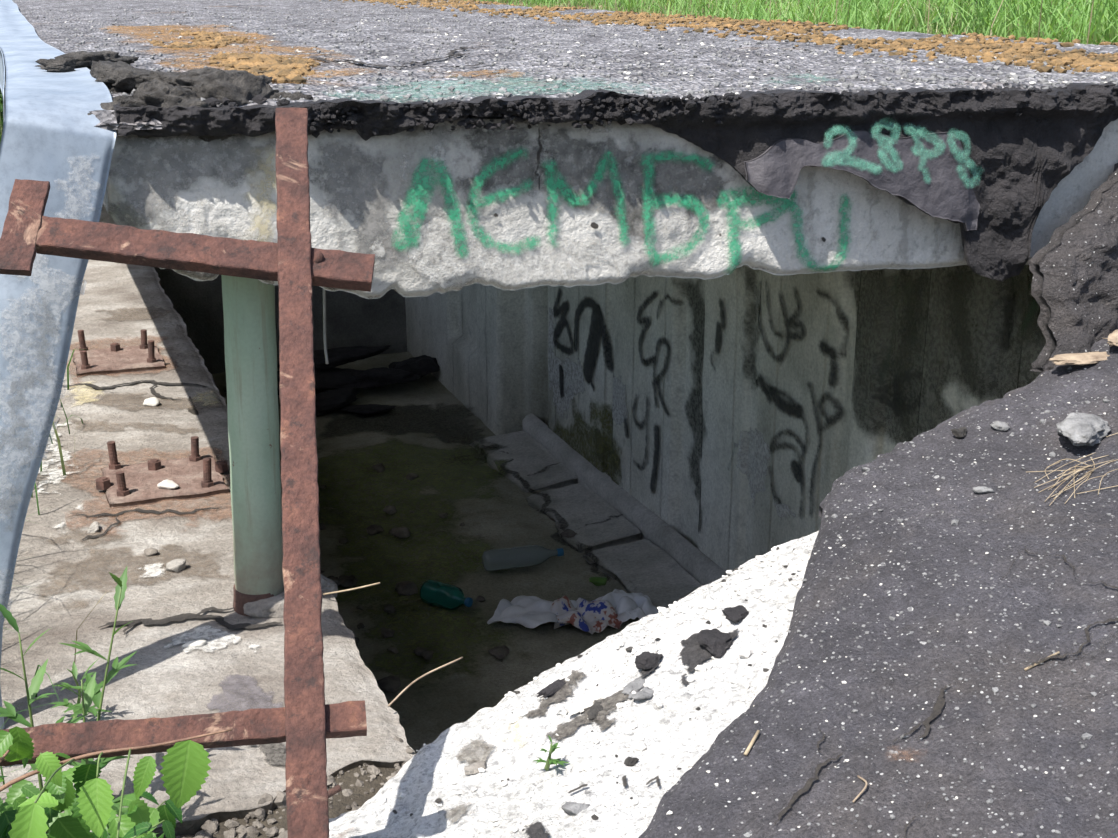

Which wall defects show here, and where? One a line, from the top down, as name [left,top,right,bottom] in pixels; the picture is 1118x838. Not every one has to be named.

rust [67,335,177,383]
crack [62,380,207,400]
leakage [682,282,706,531]
leakage [743,270,761,384]
leakage [850,265,1046,443]
rust [58,448,232,533]
crack [482,445,623,580]
crack [98,607,282,635]